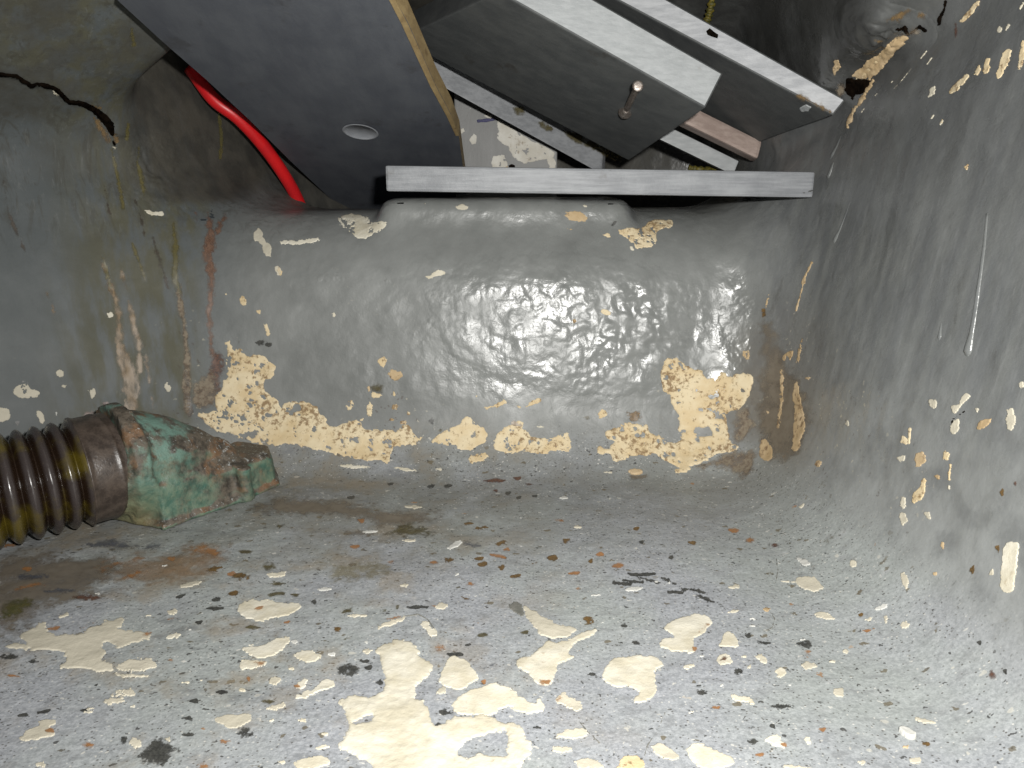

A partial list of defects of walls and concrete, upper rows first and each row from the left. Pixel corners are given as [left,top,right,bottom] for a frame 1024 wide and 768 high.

crack [0,72,116,146]
peeling [833,32,917,128]
peeling [949,40,1024,94]
rust [203,218,225,357]
peeling [198,296,571,472]
peeling [597,358,753,473]
water stain [702,325,806,475]
peeling [897,427,952,526]
peeling [989,542,1019,593]
peeling [5,617,157,714]
peeling [278,616,582,768]
peeling [602,613,712,703]